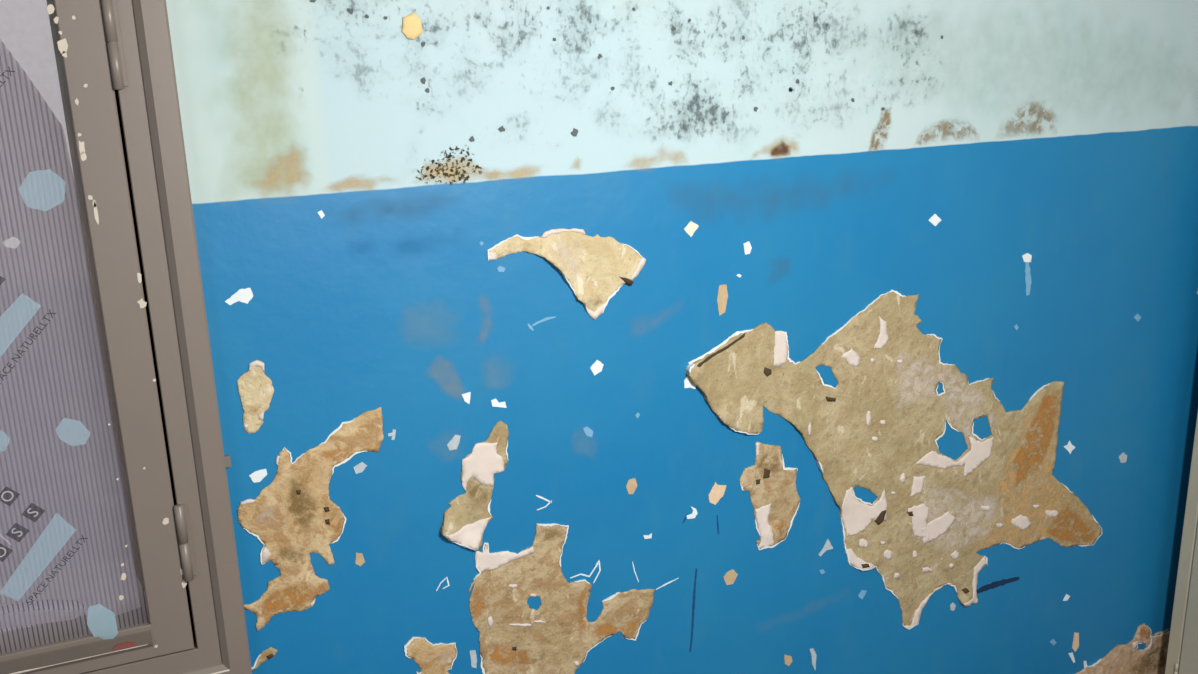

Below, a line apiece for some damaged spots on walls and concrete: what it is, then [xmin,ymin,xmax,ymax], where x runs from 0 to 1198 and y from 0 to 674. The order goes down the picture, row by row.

damp [1016,107,1050,130]
damp [416,136,531,184]
peeling [479,228,646,320]
peeling [717,274,742,316]
peeling [237,360,274,434]
peeling [684,290,1102,630]
peeling [237,407,396,632]
peeling [404,398,655,674]
spalling [1068,623,1170,674]